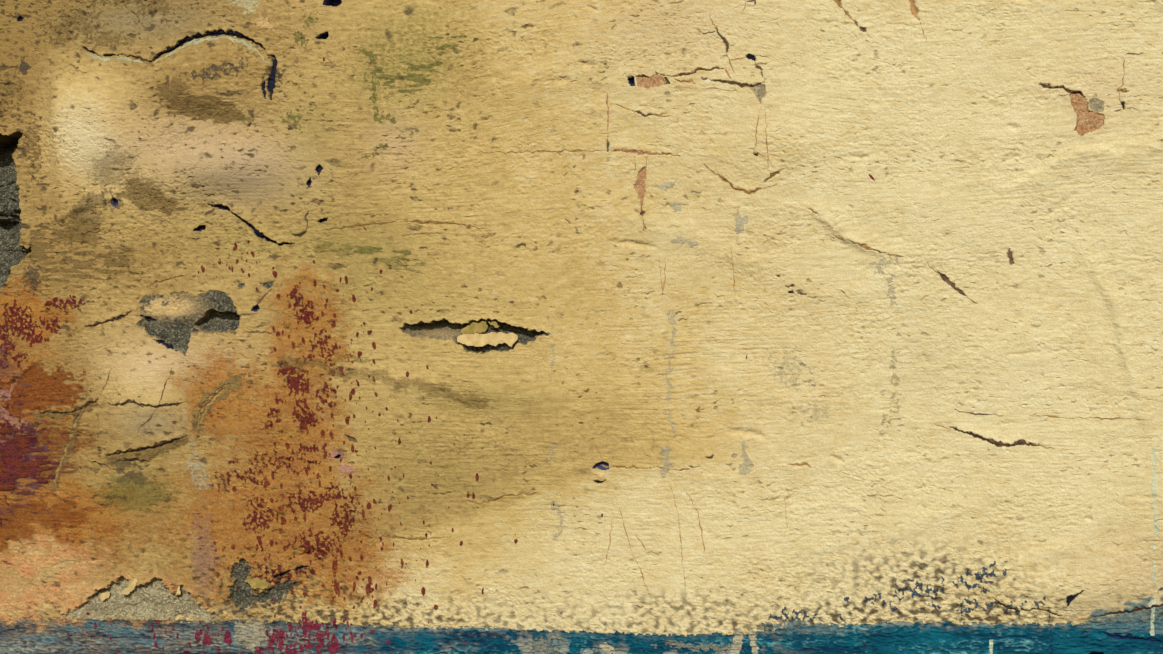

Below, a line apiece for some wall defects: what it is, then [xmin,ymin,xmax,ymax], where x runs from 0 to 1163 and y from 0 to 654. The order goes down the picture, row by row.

crack [83,29,278,100]
crack [478,18,781,195]
spalling [1039,84,1105,136]
spalling [0,132,31,290]
crack [197,203,483,245]
spalling [137,281,276,356]
spalling [398,318,550,354]
rust [0,279,136,633]
crack [43,368,230,504]
rust [180,268,397,605]
crack [936,409,1145,448]
peeling [58,558,299,638]